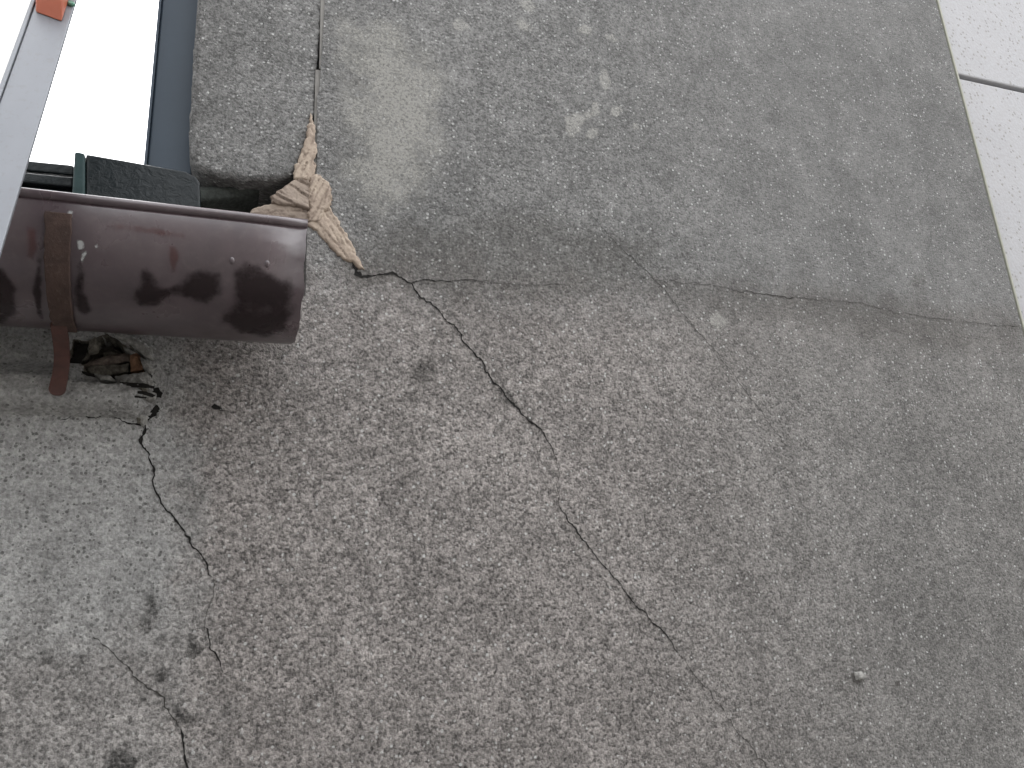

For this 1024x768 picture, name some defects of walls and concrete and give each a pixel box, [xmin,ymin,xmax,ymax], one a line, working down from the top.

spalling [70,333,163,427]
crack [590,213,1017,448]
crack [62,410,222,670]
crack [352,262,767,768]
crack [93,637,189,768]